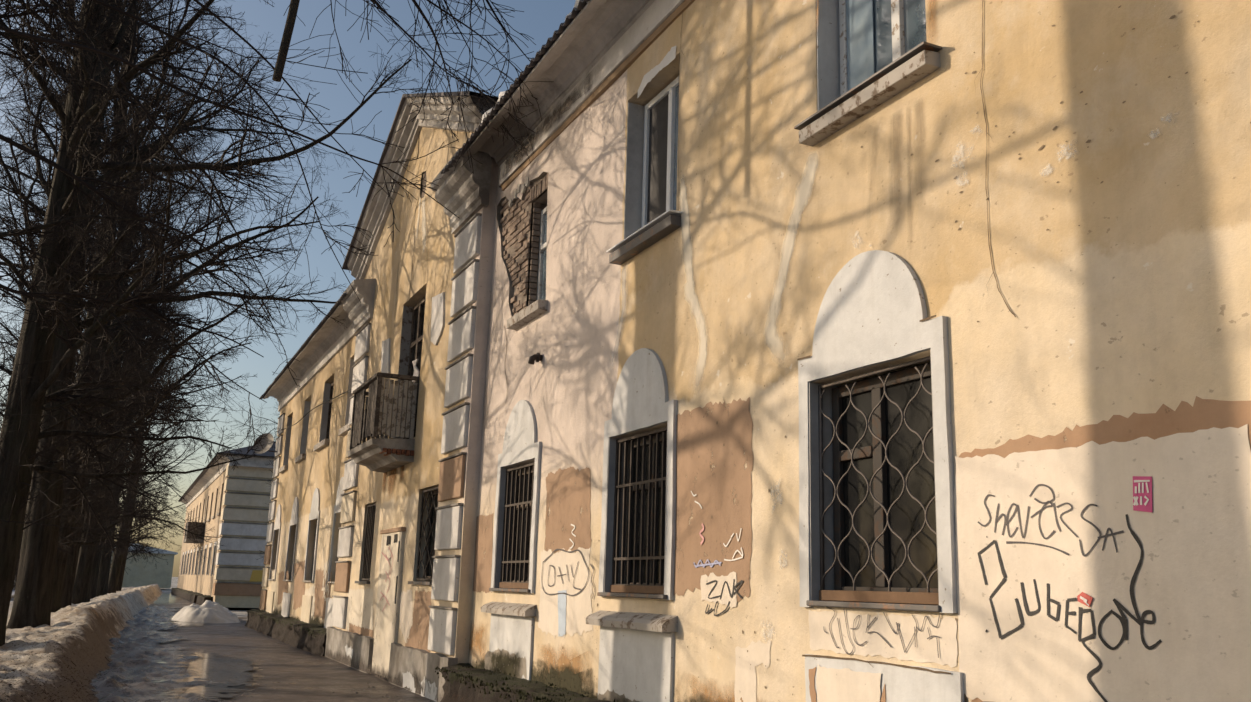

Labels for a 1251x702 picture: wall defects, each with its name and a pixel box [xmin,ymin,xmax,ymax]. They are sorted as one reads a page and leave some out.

damp [505,77,590,171]
crack [974,0,991,159]
flaking render [497,172,549,317]
crack [986,189,1016,317]